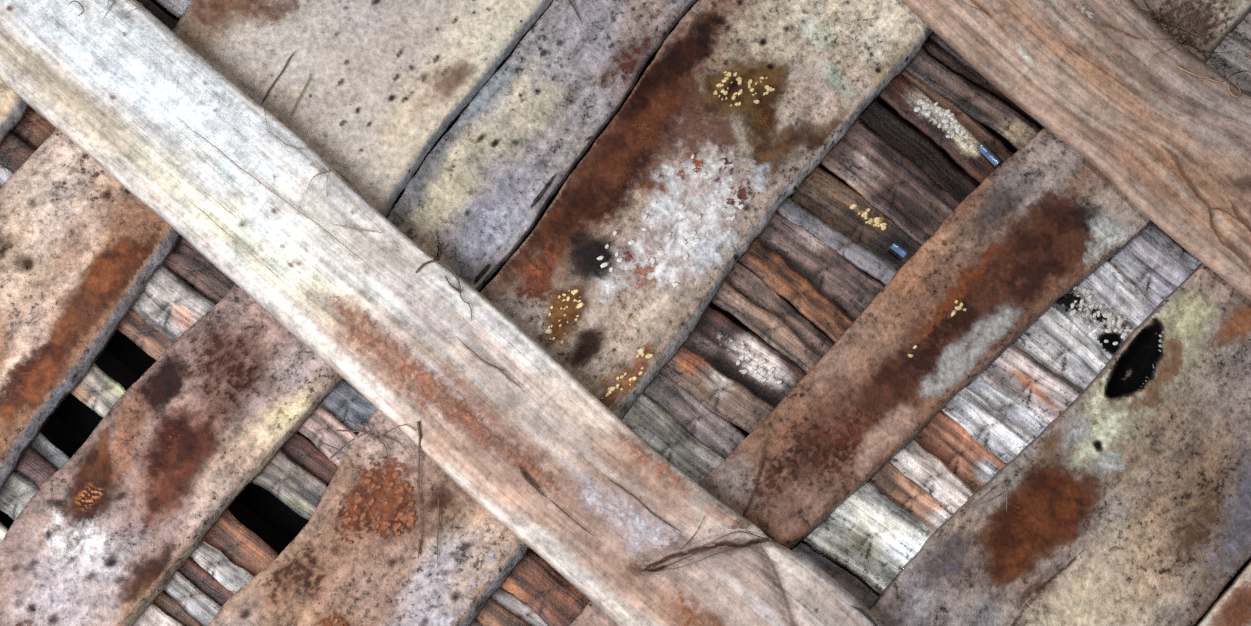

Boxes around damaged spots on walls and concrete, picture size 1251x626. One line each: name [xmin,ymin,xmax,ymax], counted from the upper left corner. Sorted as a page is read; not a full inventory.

corrosion [0,237,153,419]
corrosion [516,241,566,301]
leakage [502,0,838,296]
corrosion [862,194,1096,414]
crack [1160,144,1251,271]